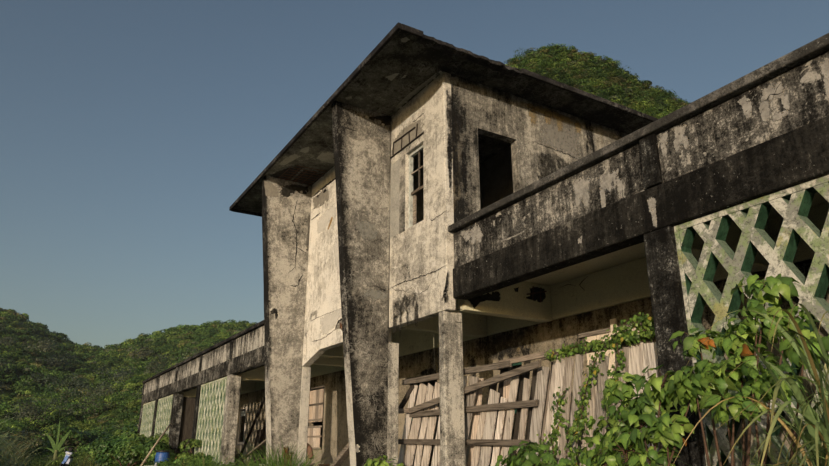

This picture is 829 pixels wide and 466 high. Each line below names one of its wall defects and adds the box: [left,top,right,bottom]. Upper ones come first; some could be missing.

peeling [820,59,829,98]
peeling [737,81,790,122]
damp [446,74,467,196]
damp [525,103,595,153]
damp [538,153,571,180]
efflorescence [647,197,657,226]
crack [283,178,335,287]
crack [371,266,444,295]
peeling [320,309,343,335]